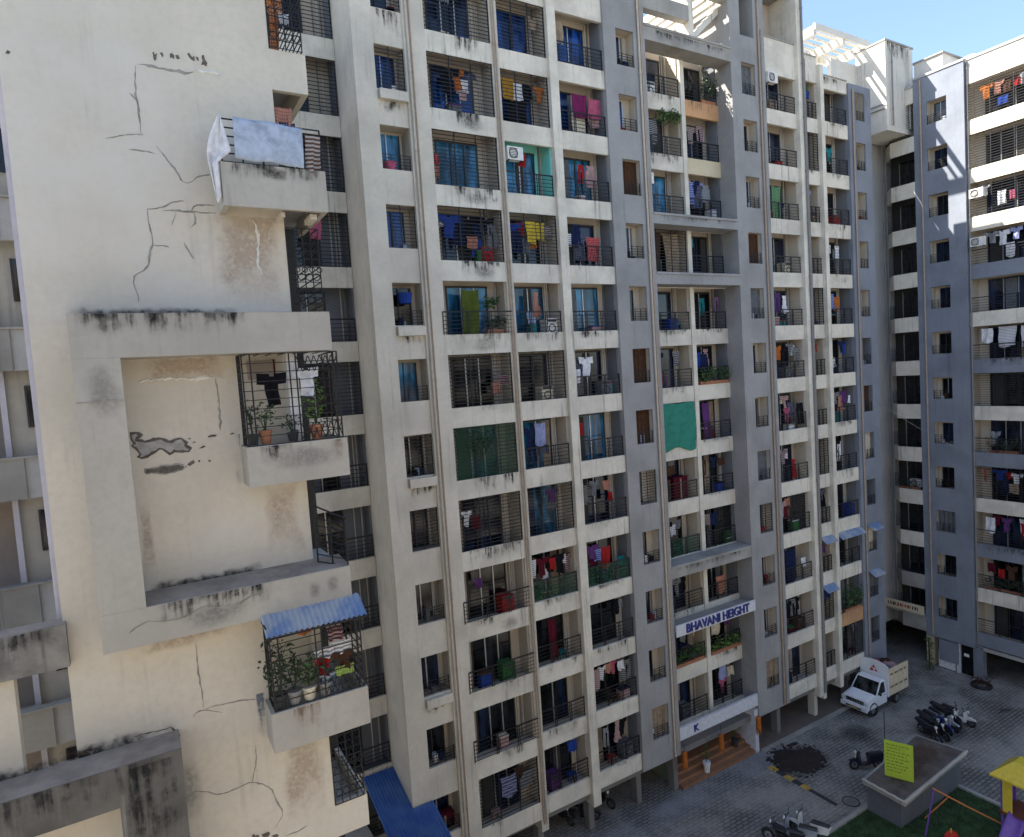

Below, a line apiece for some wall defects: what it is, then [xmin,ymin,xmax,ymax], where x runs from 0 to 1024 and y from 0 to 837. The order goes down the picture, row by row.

crack [109,64,215,301]
leakage [84,310,237,328]
spalling [130,432,234,475]
crack [195,642,256,714]
leakage [0,736,141,782]
crack [195,746,306,836]